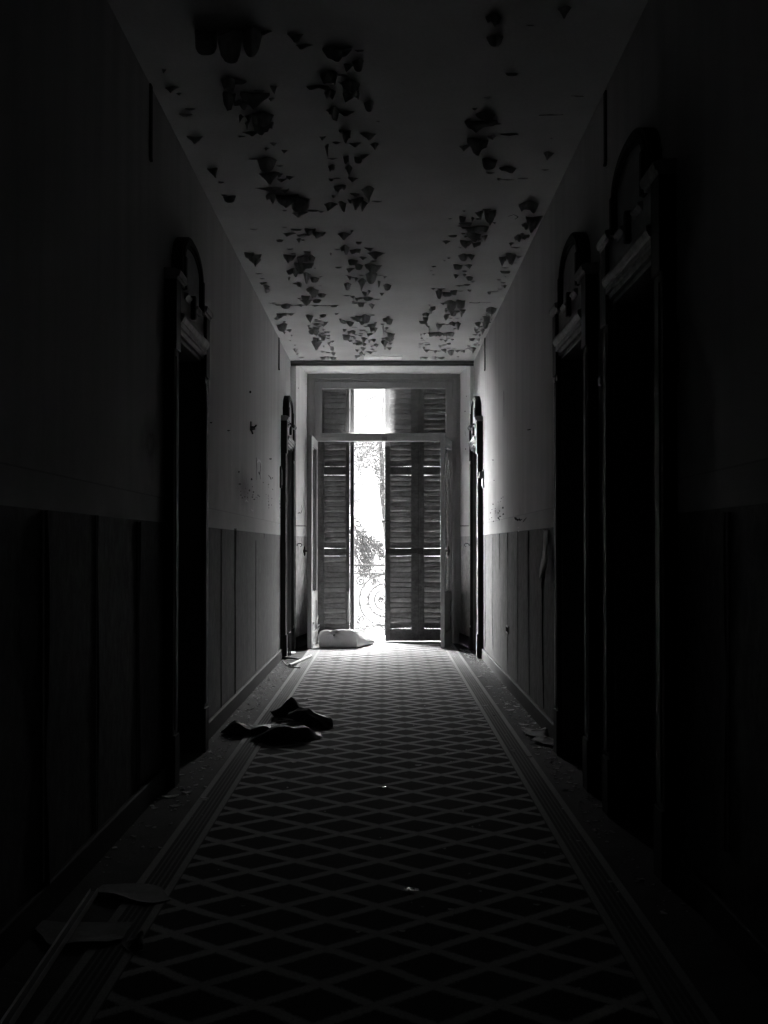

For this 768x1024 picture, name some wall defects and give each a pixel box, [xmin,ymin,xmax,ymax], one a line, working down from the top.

peeling [195,26,272,64]
peeling [459,108,528,181]
peeling [207,168,236,203]
peeling [222,33,395,360]
peeling [419,200,543,359]